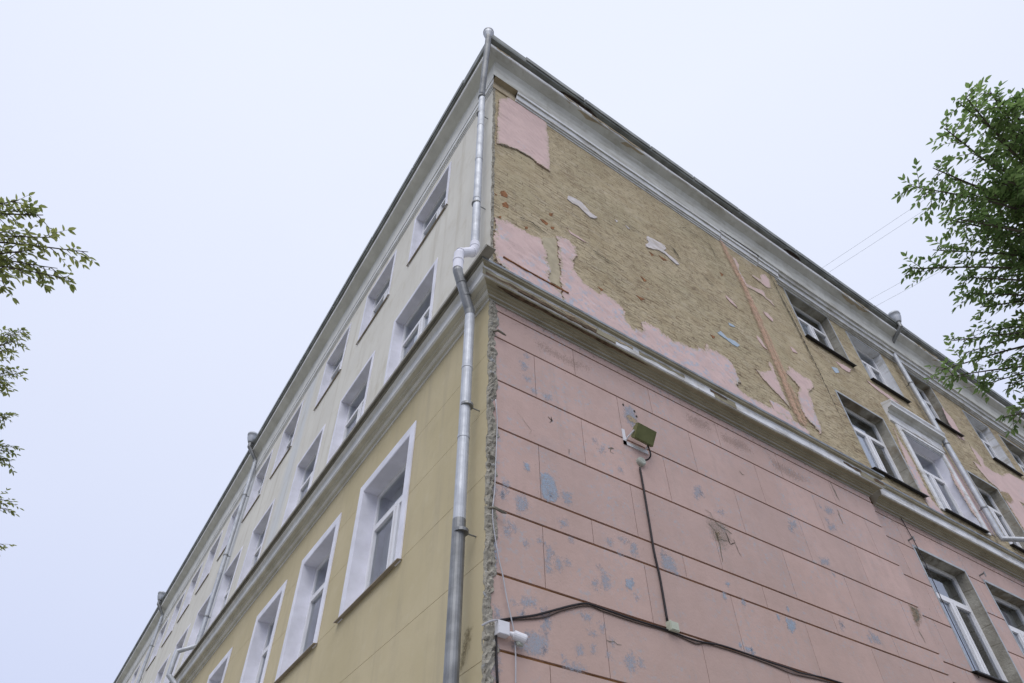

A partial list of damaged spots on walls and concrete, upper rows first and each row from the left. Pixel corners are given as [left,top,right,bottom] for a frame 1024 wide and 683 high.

spalling [481,300,516,683]
crack [708,511,742,562]
spalling [482,88,1024,558]